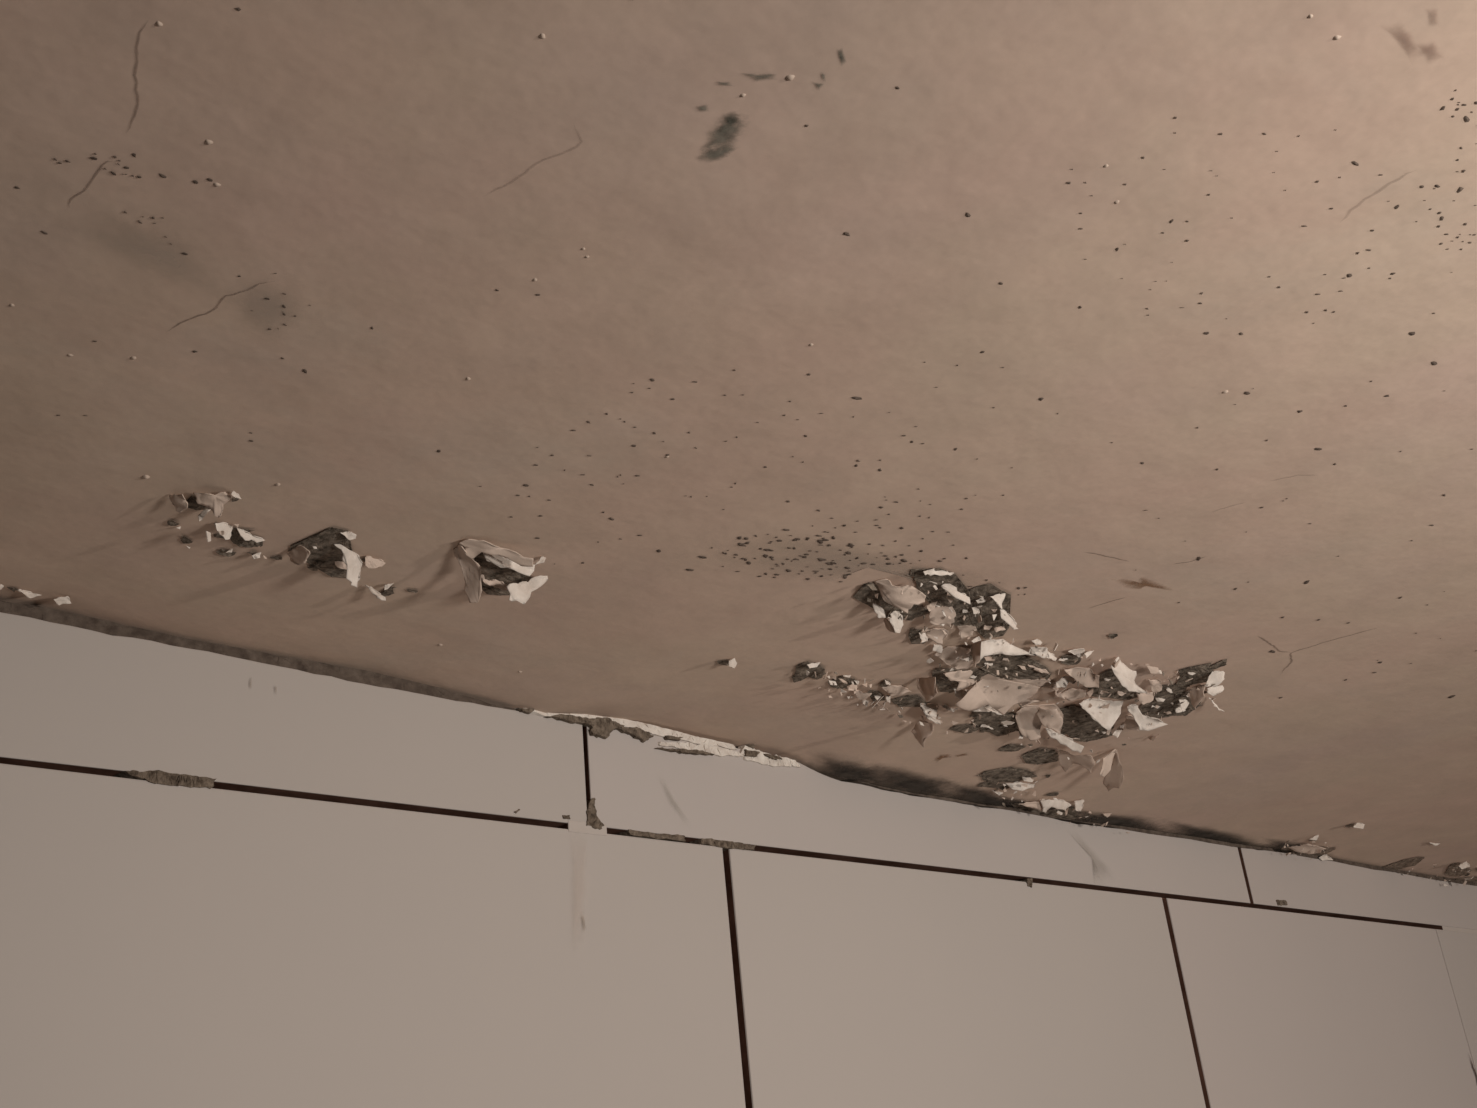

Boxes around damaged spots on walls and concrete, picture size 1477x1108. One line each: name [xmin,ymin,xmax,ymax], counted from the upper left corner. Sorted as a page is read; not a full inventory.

leakage [706,117,738,159]
peeling [167,491,418,601]
peeling [792,568,1227,827]
flaking render [1279,835,1336,861]
flaking render [1384,842,1477,886]